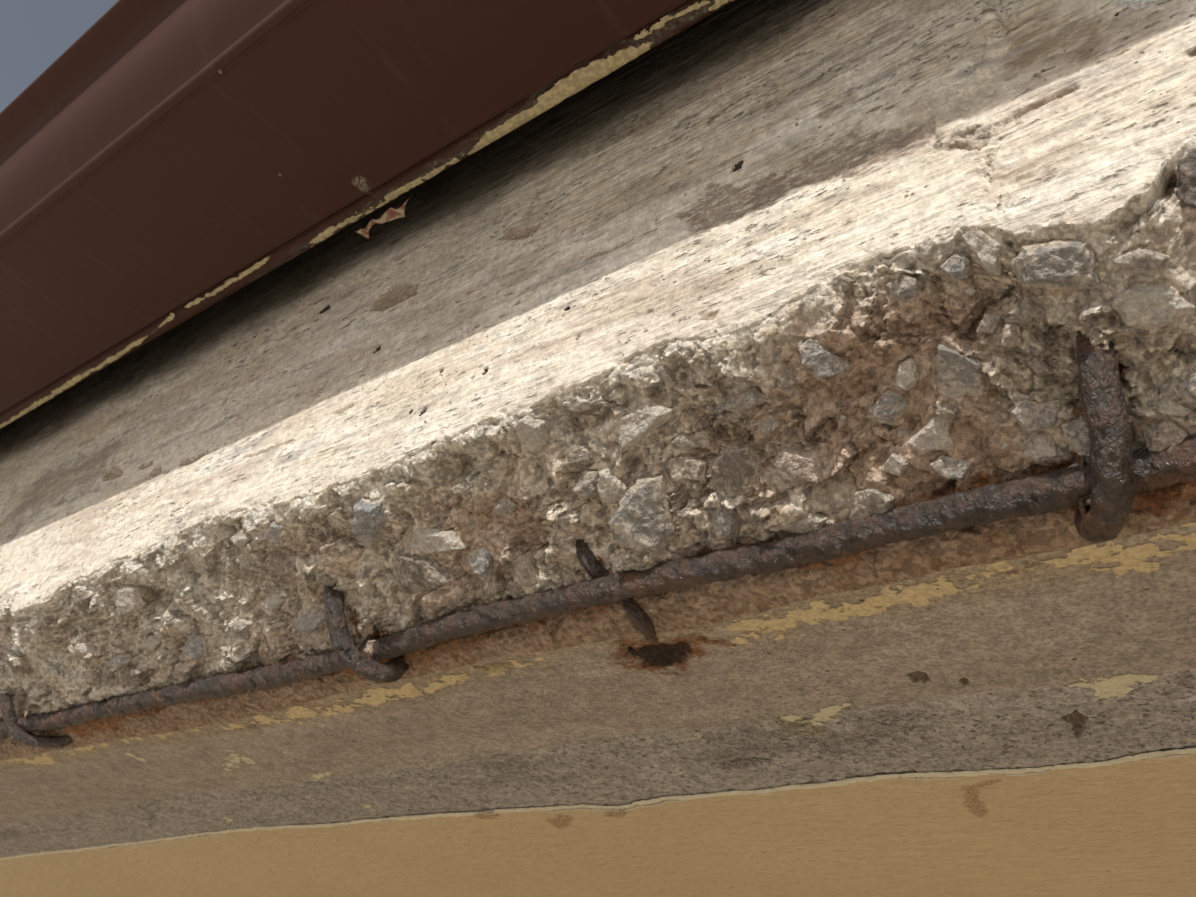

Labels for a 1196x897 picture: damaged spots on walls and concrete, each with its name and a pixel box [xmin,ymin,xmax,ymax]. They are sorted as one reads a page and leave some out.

spalling [0,126,1196,720]
corrosion [1030,452,1079,476]
corrosion [894,471,1014,508]
corrosion [348,606,389,642]
corrosion [609,634,729,675]
spalling [0,669,379,760]
spalling [1062,710,1087,736]